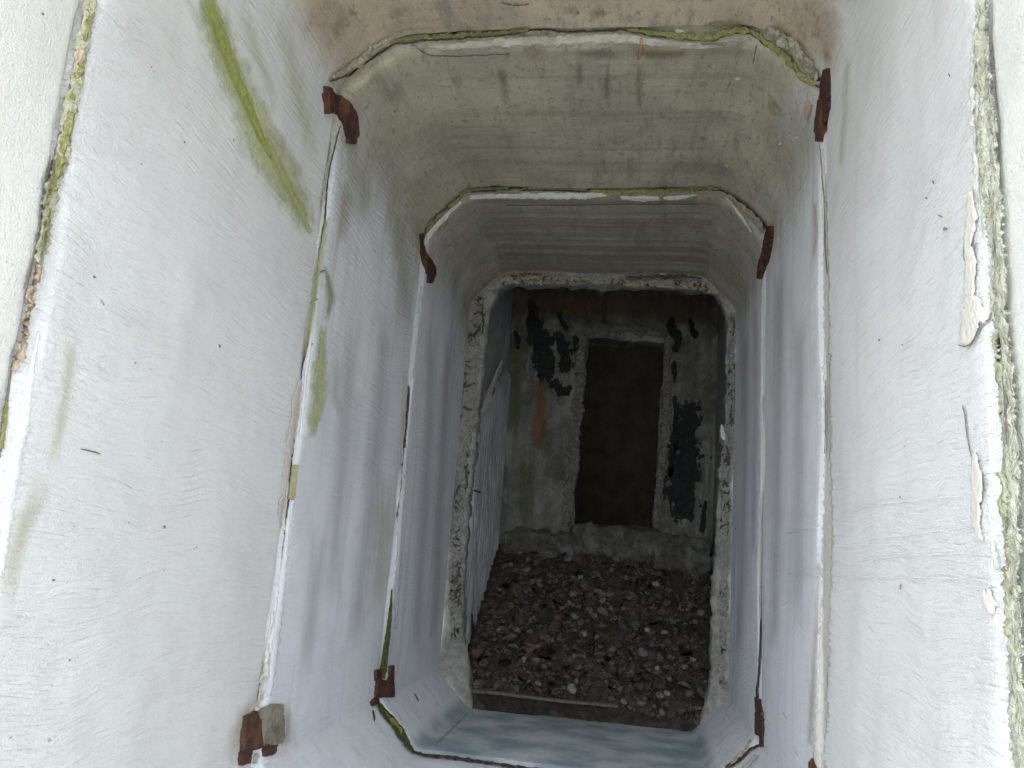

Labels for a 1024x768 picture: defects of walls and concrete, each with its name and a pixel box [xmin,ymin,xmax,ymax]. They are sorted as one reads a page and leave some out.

leakage [203,0,311,231]
peeling [958,191,992,347]
peeling [962,406,999,570]